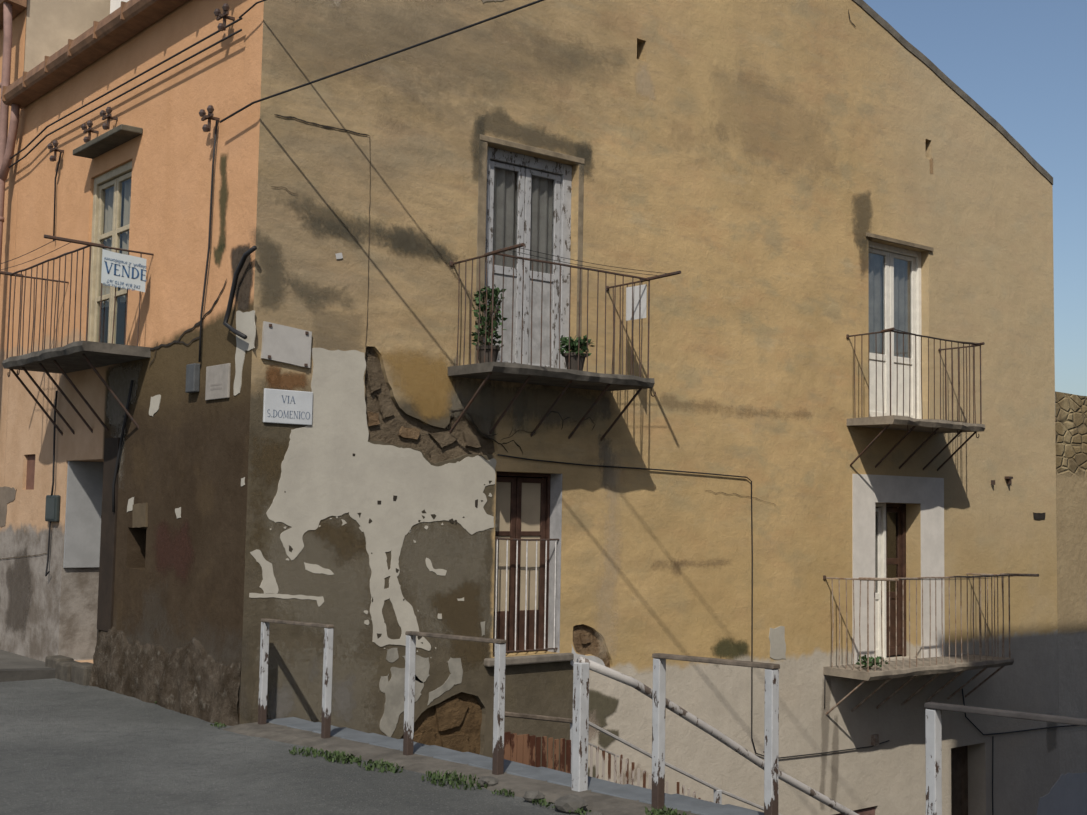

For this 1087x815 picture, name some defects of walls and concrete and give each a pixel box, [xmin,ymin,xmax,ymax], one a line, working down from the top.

water stain [214,155,253,311]
water stain [6,549,31,630]
peeling [249,549,324,607]
peeling [266,347,497,754]
spalling [570,624,610,668]
water stain [714,639,748,658]